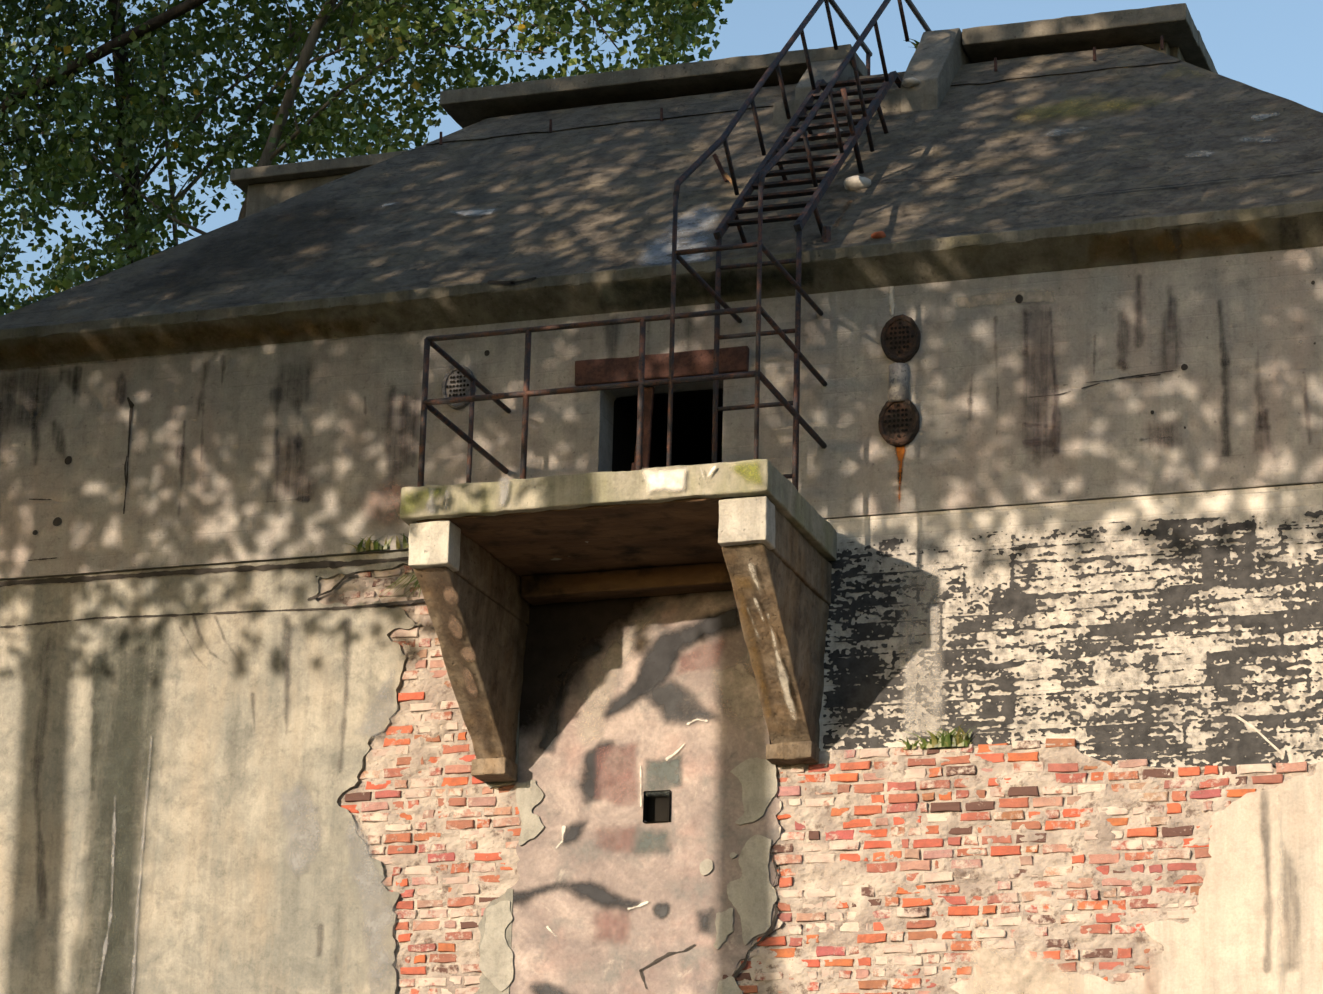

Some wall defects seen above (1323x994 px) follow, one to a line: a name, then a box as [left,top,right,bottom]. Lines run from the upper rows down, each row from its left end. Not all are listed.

damp [1220,343,1230,455]
corrosion [895,445,905,502]
crack [0,557,424,628]
damp [76,626,164,994]
spalling [317,565,545,994]
spalling [713,510,1323,994]
flaking render [700,859,713,875]